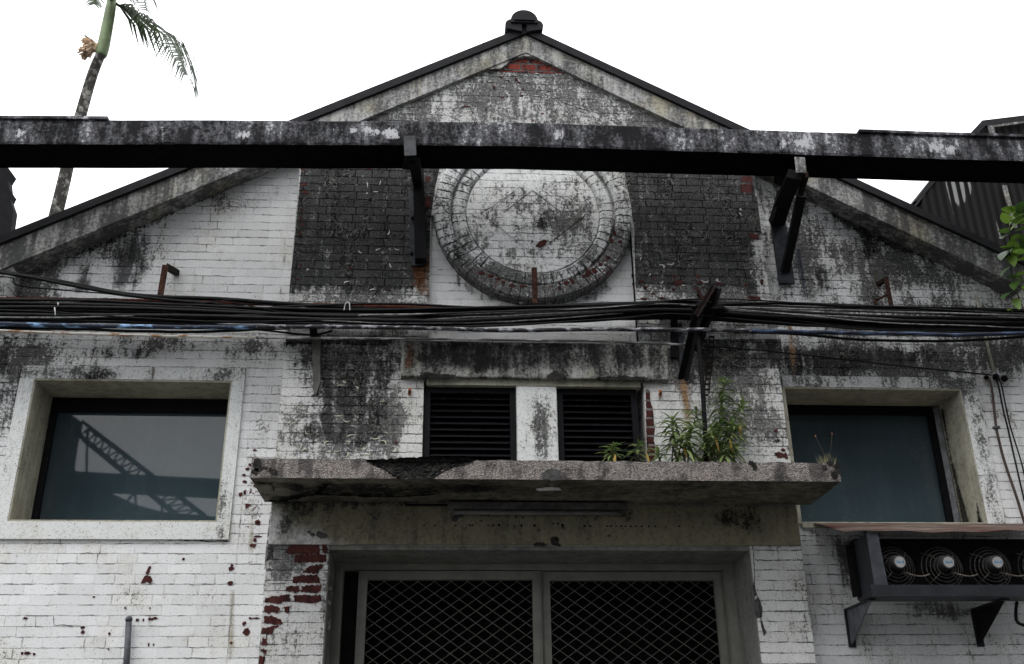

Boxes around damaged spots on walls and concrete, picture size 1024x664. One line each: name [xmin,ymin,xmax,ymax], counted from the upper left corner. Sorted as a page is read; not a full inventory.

flaking render [486,53,566,120]
leakage [830,212,961,275]
leakage [815,264,831,292]
leakage [0,336,19,413]
leakage [286,320,656,450]
leakage [702,339,956,376]
spalling [324,414,474,480]
flaking render [242,484,332,664]